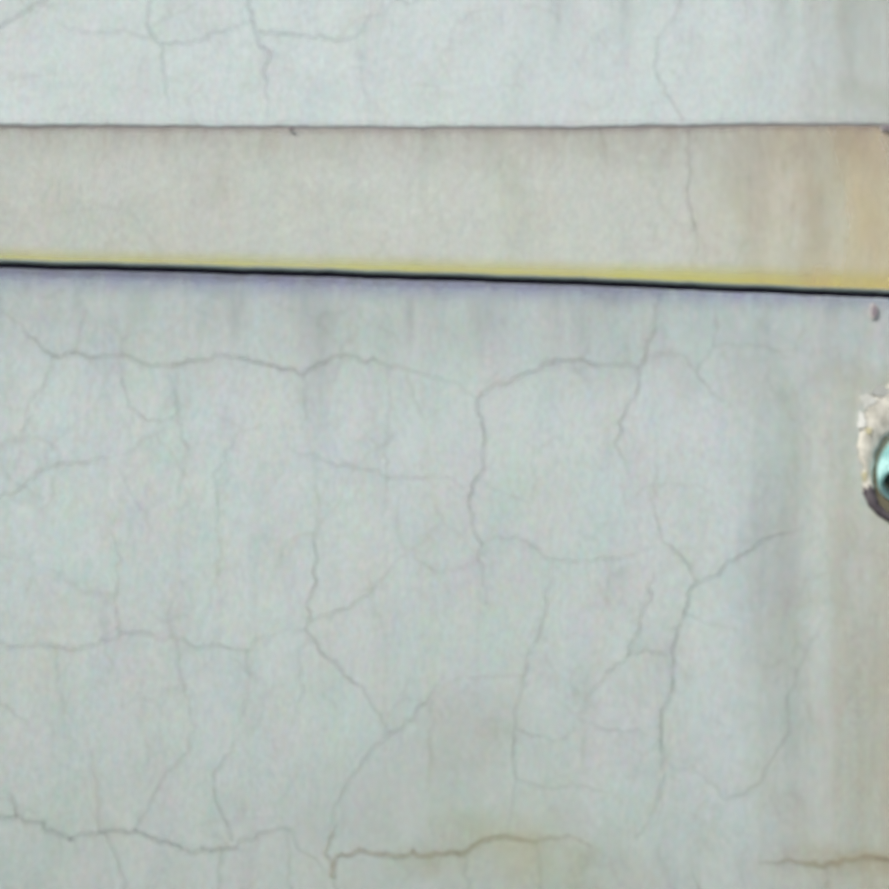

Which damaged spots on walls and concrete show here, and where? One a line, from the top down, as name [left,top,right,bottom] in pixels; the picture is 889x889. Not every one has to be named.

spalling [857,384,889,522]